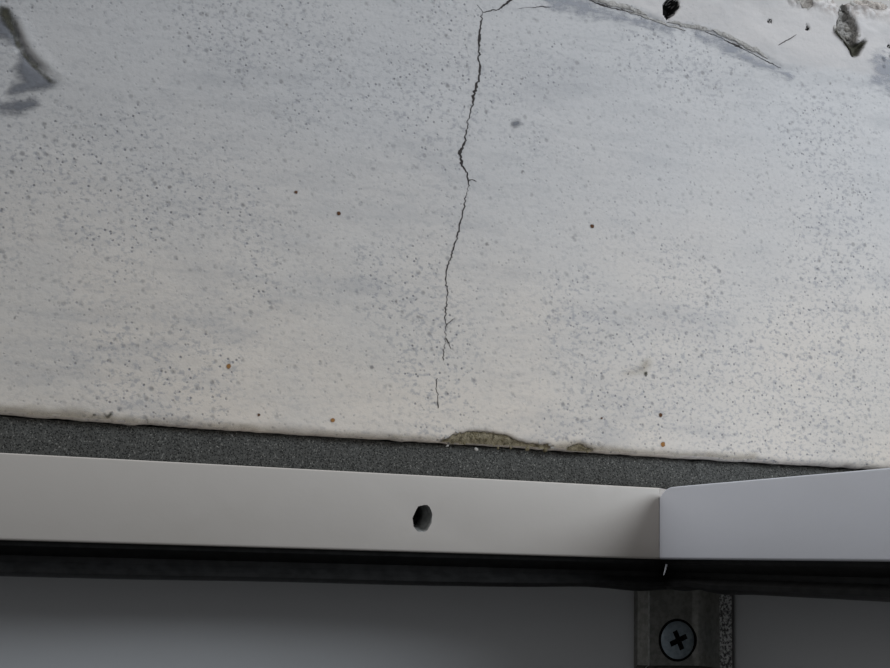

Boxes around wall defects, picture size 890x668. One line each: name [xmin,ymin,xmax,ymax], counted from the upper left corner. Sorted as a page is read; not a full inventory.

peeling [590,0,780,68]
spalling [796,0,813,10]
spalling [833,0,887,57]
leakage [0,100,37,114]
crack [436,0,550,408]